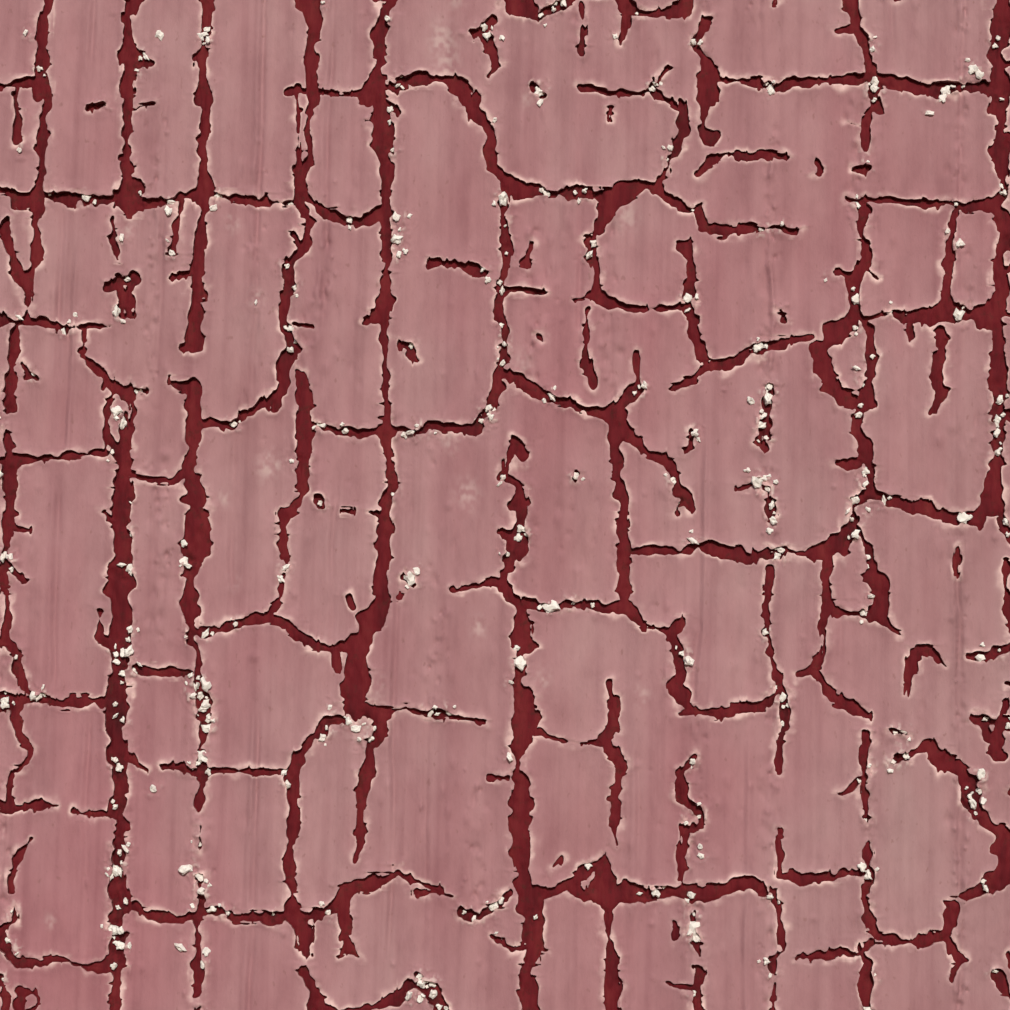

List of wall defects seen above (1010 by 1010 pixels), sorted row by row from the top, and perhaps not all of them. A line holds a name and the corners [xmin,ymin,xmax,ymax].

peeling [529,83,547,107]
peeling [814,159,824,177]
peeling [851,160,871,177]
peeling [519,242,534,269]
peeling [397,340,419,364]
peeling [682,429,701,454]
peeling [753,419,766,447]
crack [0,0,487,1010]
peeling [314,494,325,509]
crack [389,0,1010,1010]
peeling [346,593,356,611]
peeling [671,920,680,941]